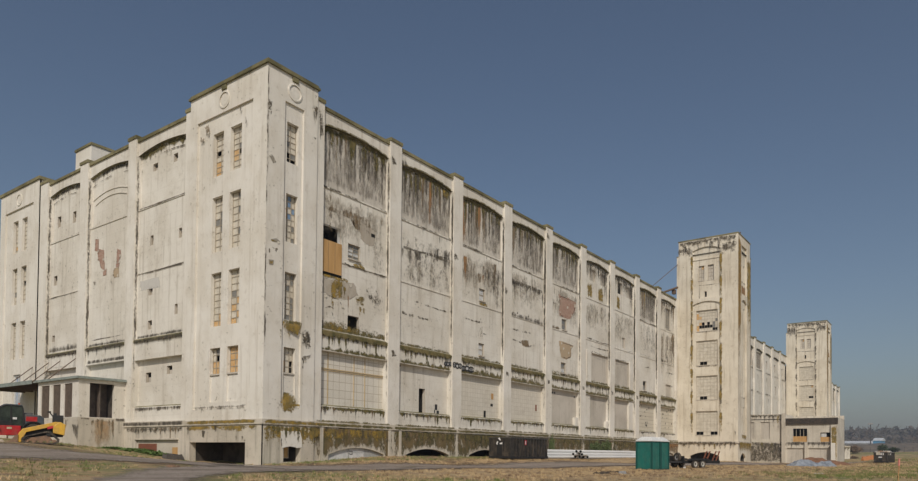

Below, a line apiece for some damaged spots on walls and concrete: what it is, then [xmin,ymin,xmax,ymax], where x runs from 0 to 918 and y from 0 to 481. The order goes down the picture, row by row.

damp [314,106,389,232]
spalling [93,239,121,285]
damp [401,172,674,367]
damp [678,234,737,257]
flaking render [322,273,365,315]
spalling [559,295,576,319]
spalling [559,341,573,360]